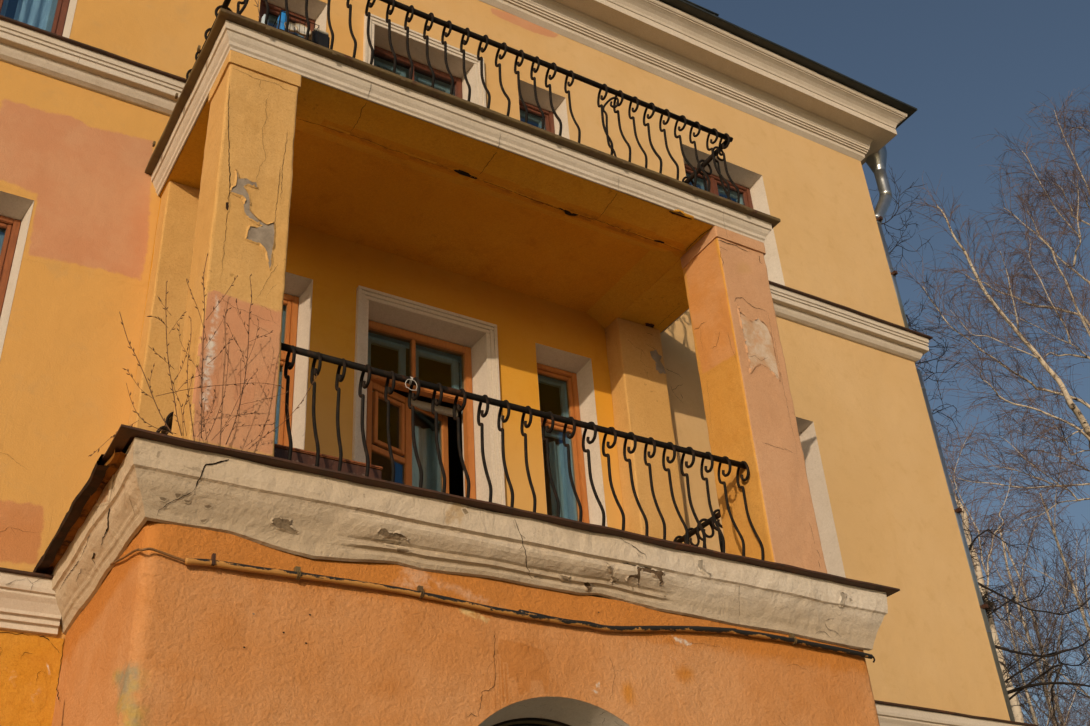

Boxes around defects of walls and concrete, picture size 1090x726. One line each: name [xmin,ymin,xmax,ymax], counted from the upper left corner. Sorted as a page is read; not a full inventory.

peeling [230,169,276,271]
crack [220,72,761,331]
peeling [735,304,782,384]
crack [12,459,229,593]
peeling [270,516,301,534]
peeling [374,526,412,554]
spalling [604,561,665,587]
crack [469,631,496,717]